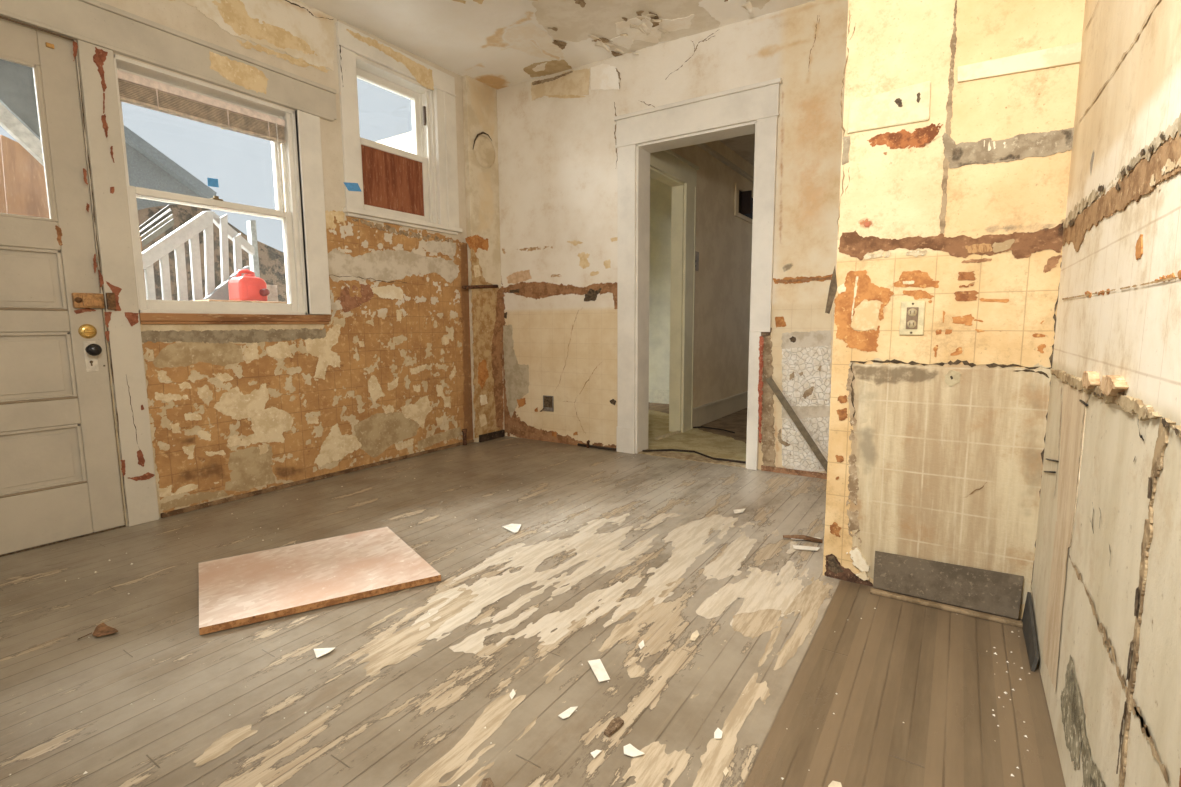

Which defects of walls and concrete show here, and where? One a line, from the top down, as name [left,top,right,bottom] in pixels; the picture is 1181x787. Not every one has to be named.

spalling [74,210,459,380]
flaking render [155,369,362,467]
flaking render [121,450,198,497]